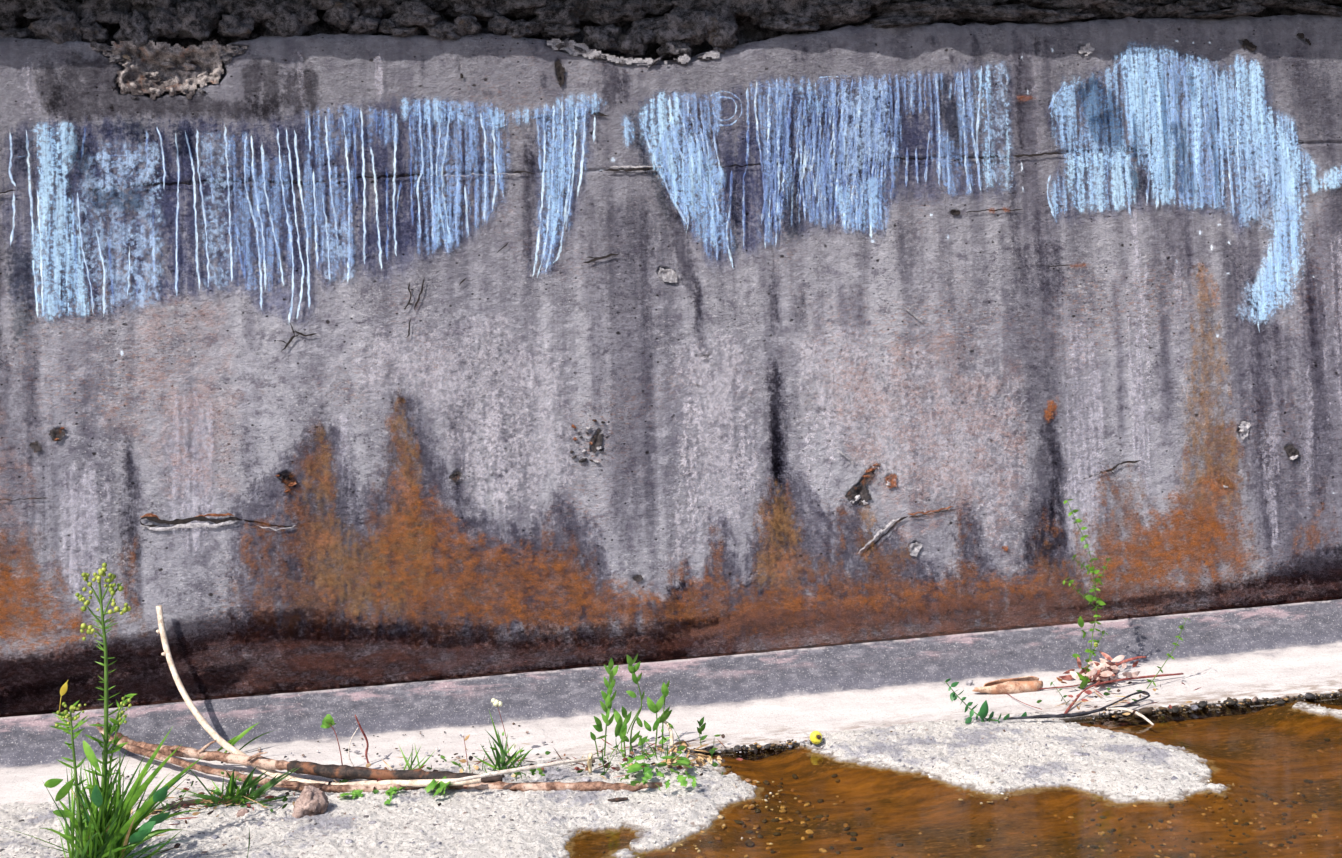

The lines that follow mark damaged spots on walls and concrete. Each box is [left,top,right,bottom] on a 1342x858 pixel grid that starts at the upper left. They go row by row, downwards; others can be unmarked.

spalling [90,40,247,100]
crack [140,513,296,531]
corrosion [0,270,1342,717]
spalling [845,463,897,505]
leakage [1069,548,1342,622]
leakage [0,608,718,717]